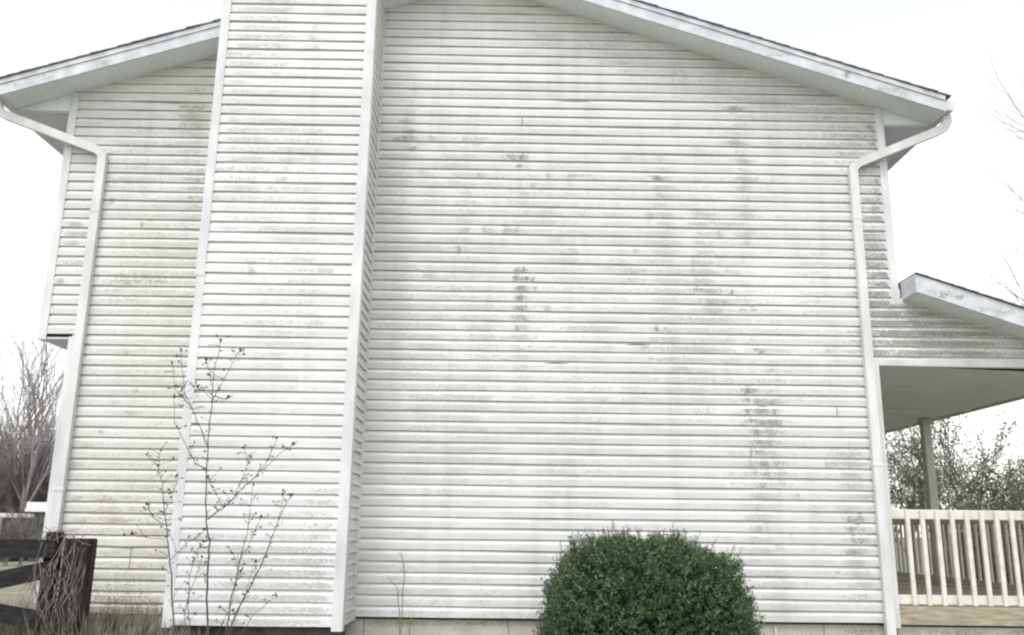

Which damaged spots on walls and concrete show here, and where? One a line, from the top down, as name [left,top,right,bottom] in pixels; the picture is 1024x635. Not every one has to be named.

leakage [370,35,1024,611]